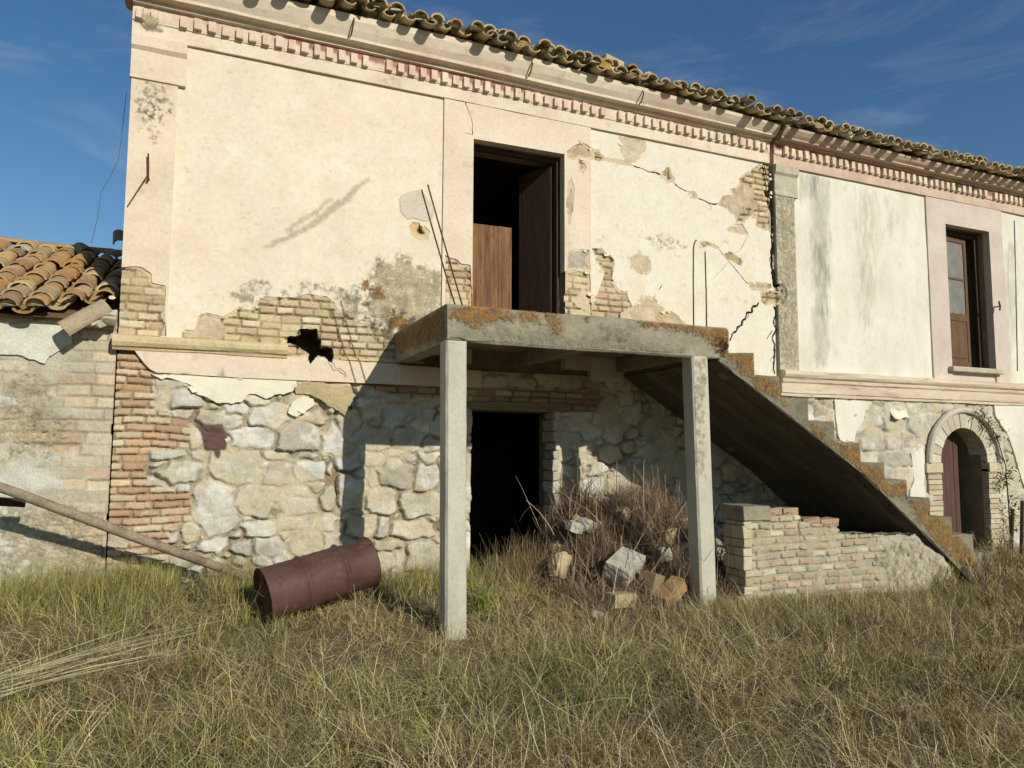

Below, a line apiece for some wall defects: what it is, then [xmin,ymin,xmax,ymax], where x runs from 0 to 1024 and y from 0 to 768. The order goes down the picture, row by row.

flaking render [409,185,471,306]
flaking render [566,135,646,225]
flaking render [564,240,743,327]
flaking render [716,165,773,236]
crack [729,164,783,372]
flaking render [181,294,403,365]